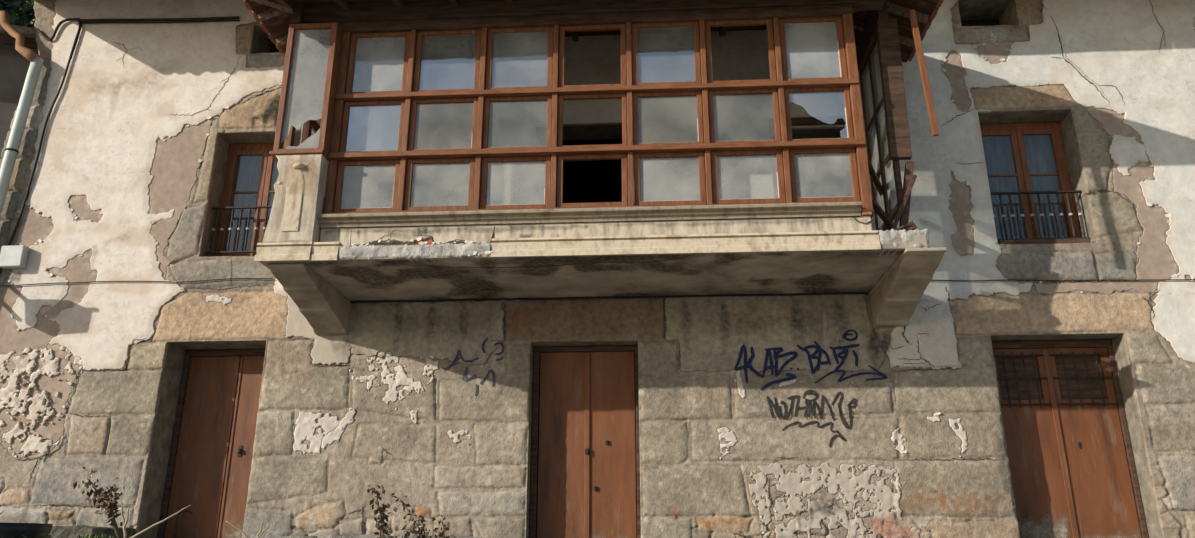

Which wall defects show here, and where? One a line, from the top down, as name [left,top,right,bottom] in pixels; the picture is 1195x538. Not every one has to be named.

flaking render [940,42,1014,112]
crack [1038,0,1125,106]
flaking render [1088,107,1143,144]
flaking render [17,205,54,247]
flaking render [68,195,103,222]
flaking render [148,82,282,279]
flaking render [852,171,975,294]
flaking render [1033,159,1191,295]
flaking render [0,249,98,355]